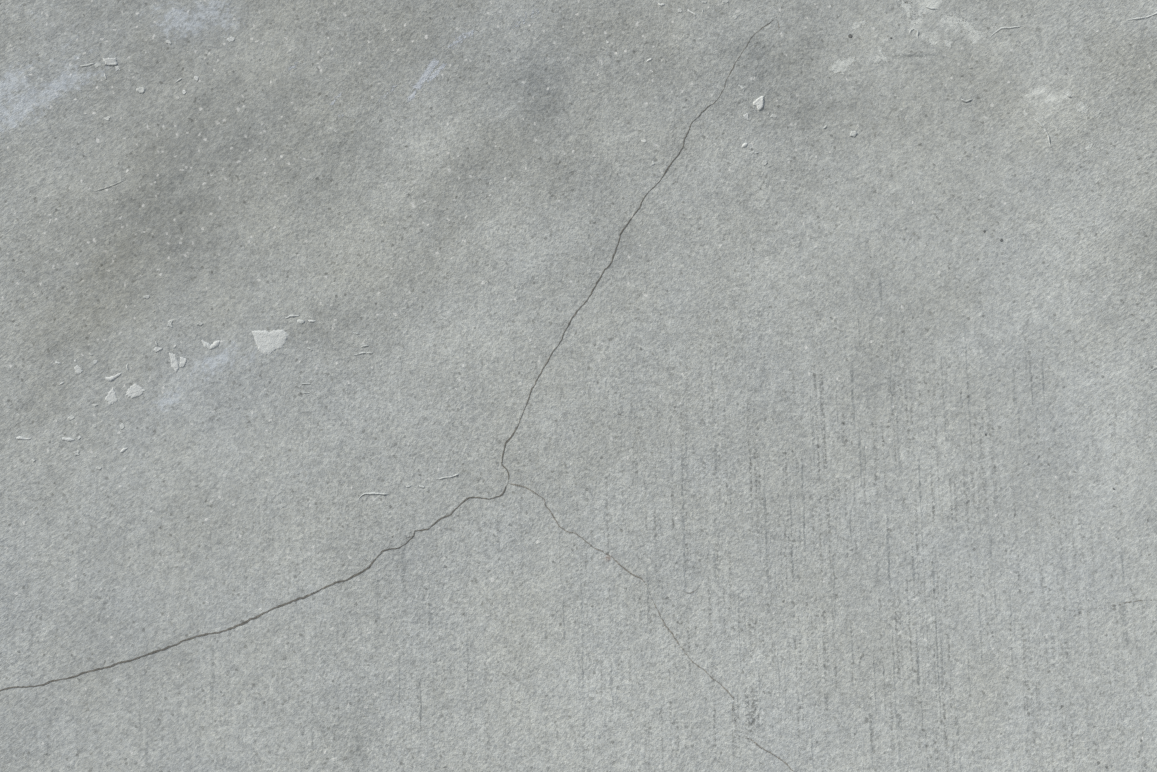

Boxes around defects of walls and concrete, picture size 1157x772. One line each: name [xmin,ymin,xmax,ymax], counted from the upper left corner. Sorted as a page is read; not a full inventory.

crack [0,11,794,772]